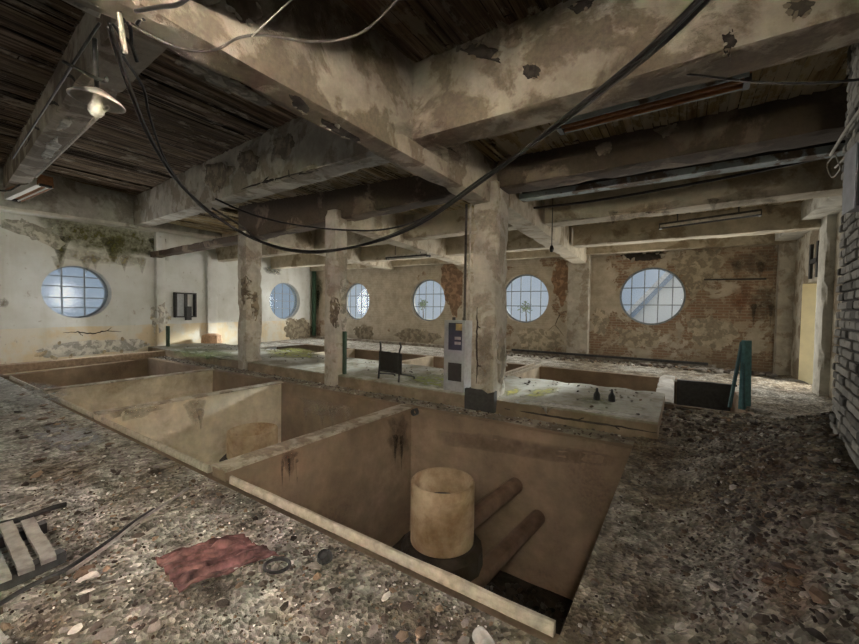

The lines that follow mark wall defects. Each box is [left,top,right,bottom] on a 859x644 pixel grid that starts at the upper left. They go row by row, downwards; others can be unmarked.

spalling [224,0,262,27]
spalling [783,0,816,22]
spalling [722,27,738,62]
water stain [44,217,154,267]
spalling [620,251,666,263]
spalling [441,264,463,318]
spalling [551,260,568,307]
crack [64,328,119,336]
peeling [34,302,171,359]
peeling [686,316,740,352]